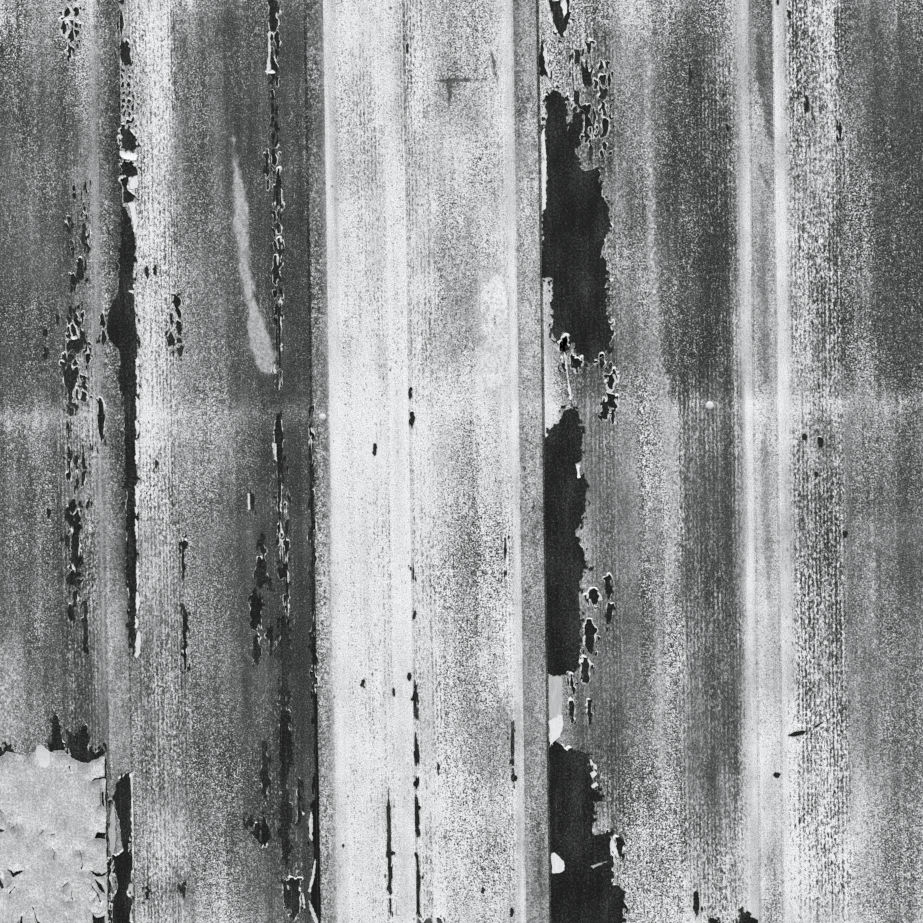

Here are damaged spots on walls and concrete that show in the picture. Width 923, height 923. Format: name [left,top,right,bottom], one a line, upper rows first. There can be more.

peeling [116,64,144,230]
peeling [546,0,575,44]
water stain [643,55,653,141]
peeling [165,293,188,362]
water stain [232,159,276,373]
water stain [645,154,659,340]
peeling [56,300,98,605]
peeling [540,38,629,923]
water stain [659,375,680,582]
water stain [654,651,666,787]
peeling [0,713,109,923]
peeling [736,906,758,923]